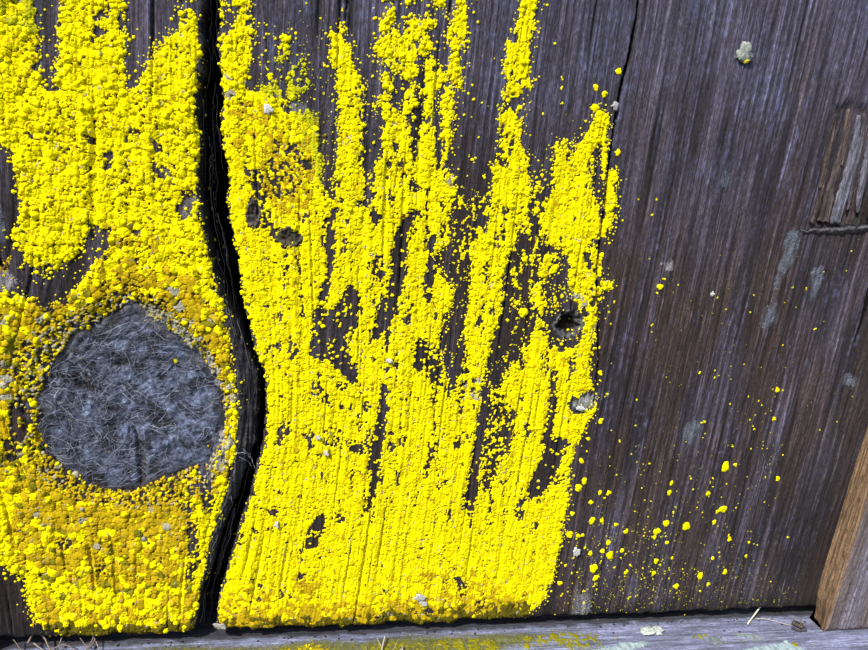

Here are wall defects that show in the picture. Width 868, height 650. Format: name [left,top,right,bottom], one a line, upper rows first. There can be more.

crack [193,0,267,626]
crack [593,0,639,402]
crack [799,223,868,234]